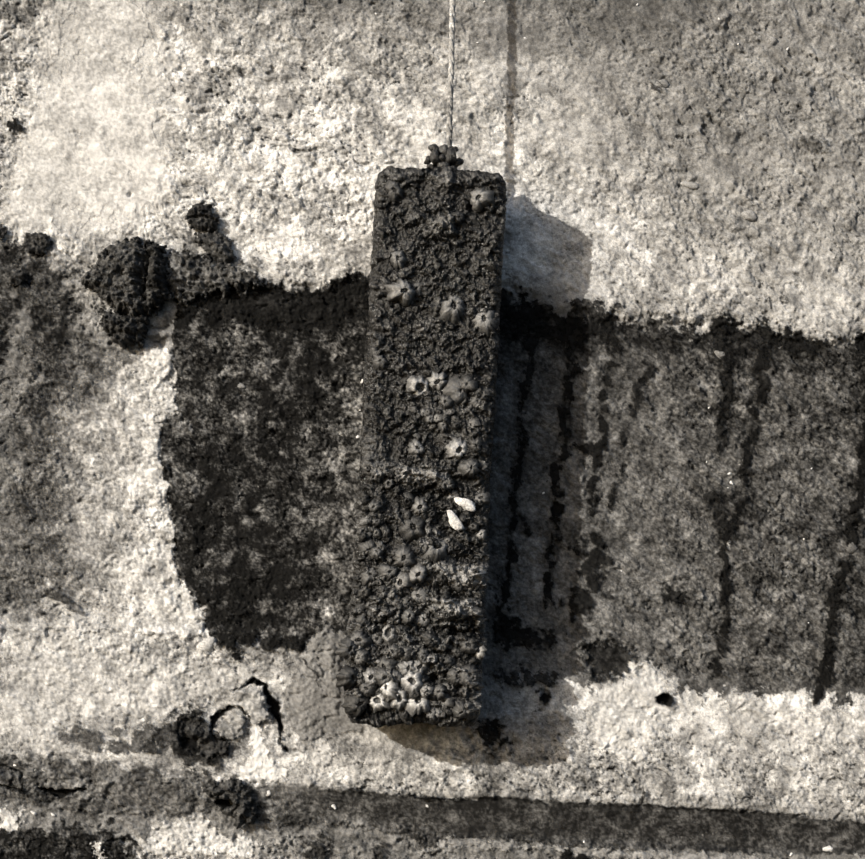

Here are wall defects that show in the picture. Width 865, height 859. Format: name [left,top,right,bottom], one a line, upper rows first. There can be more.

damp [159,268,370,653]
damp [481,286,865,710]
crack [210,678,288,752]
damp [560,847,589,859]